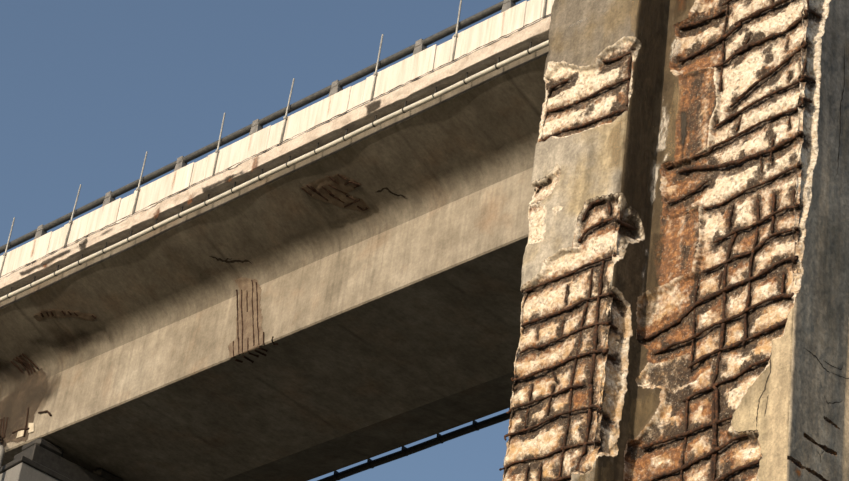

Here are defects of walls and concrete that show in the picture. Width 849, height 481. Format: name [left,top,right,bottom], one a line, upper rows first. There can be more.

crack [1,14,551,277]
corrosion [668,67,716,161]
spalling [499,0,831,481]
corrosion [654,207,699,286]
crack [806,349,849,379]
spalling [803,432,837,456]